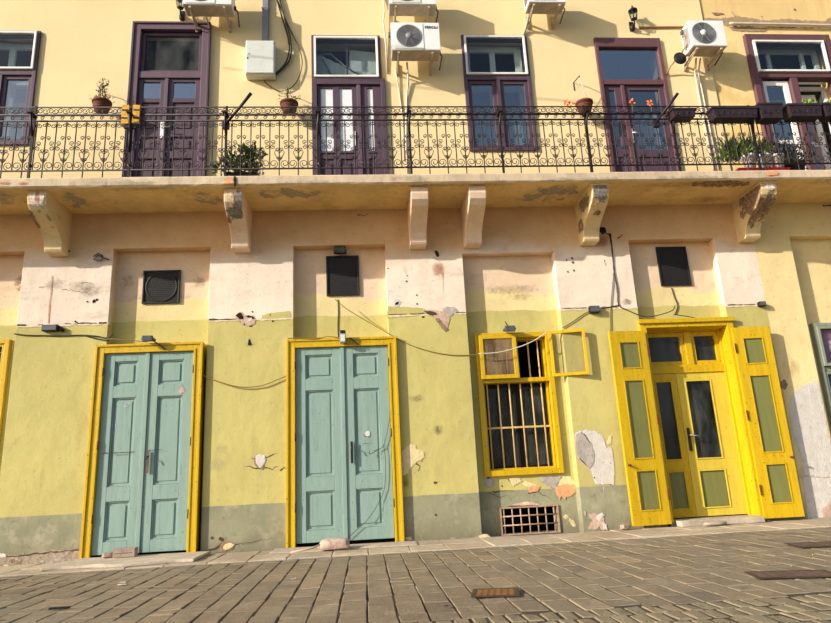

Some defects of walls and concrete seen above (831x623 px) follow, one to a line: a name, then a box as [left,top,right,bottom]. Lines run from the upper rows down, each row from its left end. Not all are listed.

peeling [223,176,244,224]
peeling [578,186,609,233]
spalling [739,183,776,229]
peeling [246,453,286,471]
peeling [401,444,425,476]
peeling [575,429,615,494]
peeling [781,379,831,519]
peeling [484,476,576,507]
flaking render [0,549,80,566]
flaking render [206,537,271,552]